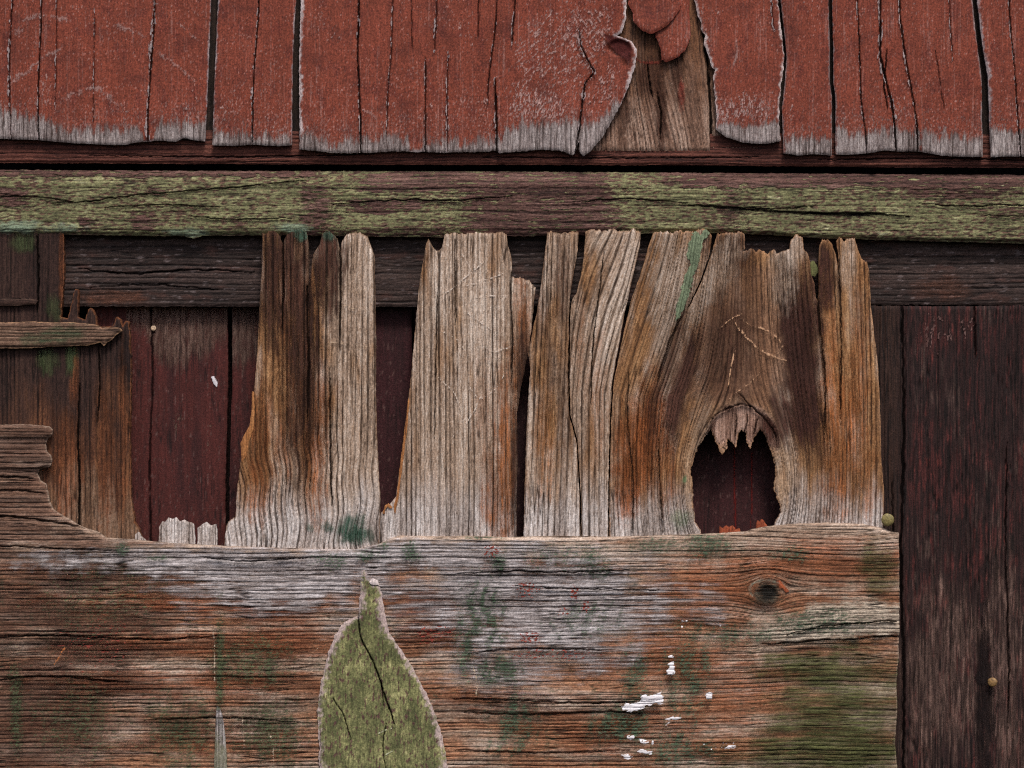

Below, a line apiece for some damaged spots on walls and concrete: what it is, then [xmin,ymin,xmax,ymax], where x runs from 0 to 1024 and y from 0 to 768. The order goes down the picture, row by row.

peeling [628,0,702,62]
peeling [423,0,620,156]
crack [478,0,759,159]
crack [819,0,1024,161]
peeling [0,98,410,154]
peeling [716,92,1024,157]
crack [358,616,395,762]
peeling [622,692,664,713]
peeling [622,735,654,760]